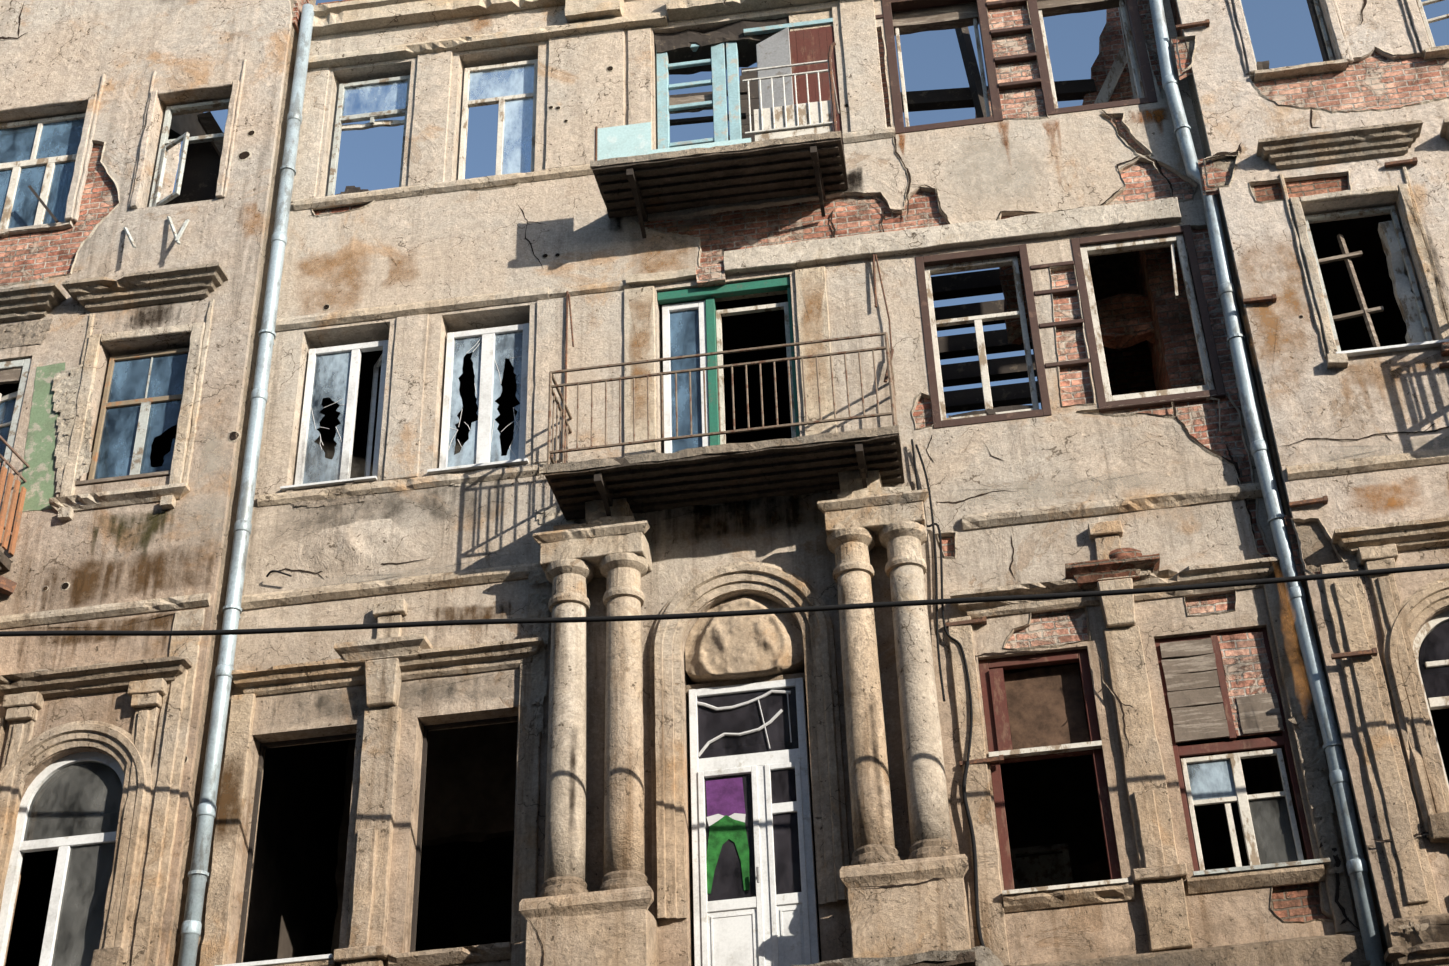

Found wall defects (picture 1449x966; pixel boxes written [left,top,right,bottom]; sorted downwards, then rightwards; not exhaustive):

crack [1359,0,1367,24]
flaking render [1249,46,1449,114]
flaking render [0,140,120,288]
flaking render [633,186,952,266]
crack [867,137,950,232]
flaking render [997,113,1352,220]
flaking render [1048,225,1273,558]
crack [1283,423,1449,446]
water stain [54,510,194,605]
crack [269,568,325,580]
crack [380,558,426,566]
water stain [51,614,175,644]